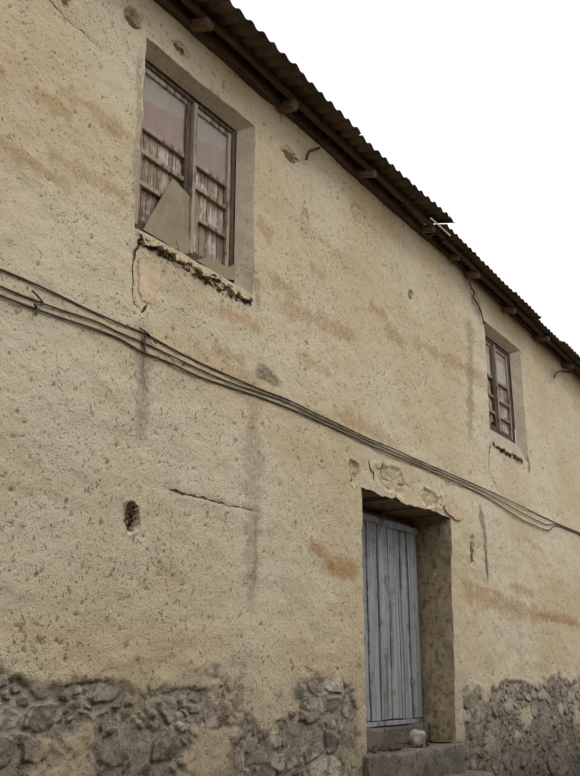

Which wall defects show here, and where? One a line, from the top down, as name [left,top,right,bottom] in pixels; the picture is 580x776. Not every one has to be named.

crack [131,244,147,313]
flaking render [123,500,140,534]
crack [167,489,253,511]